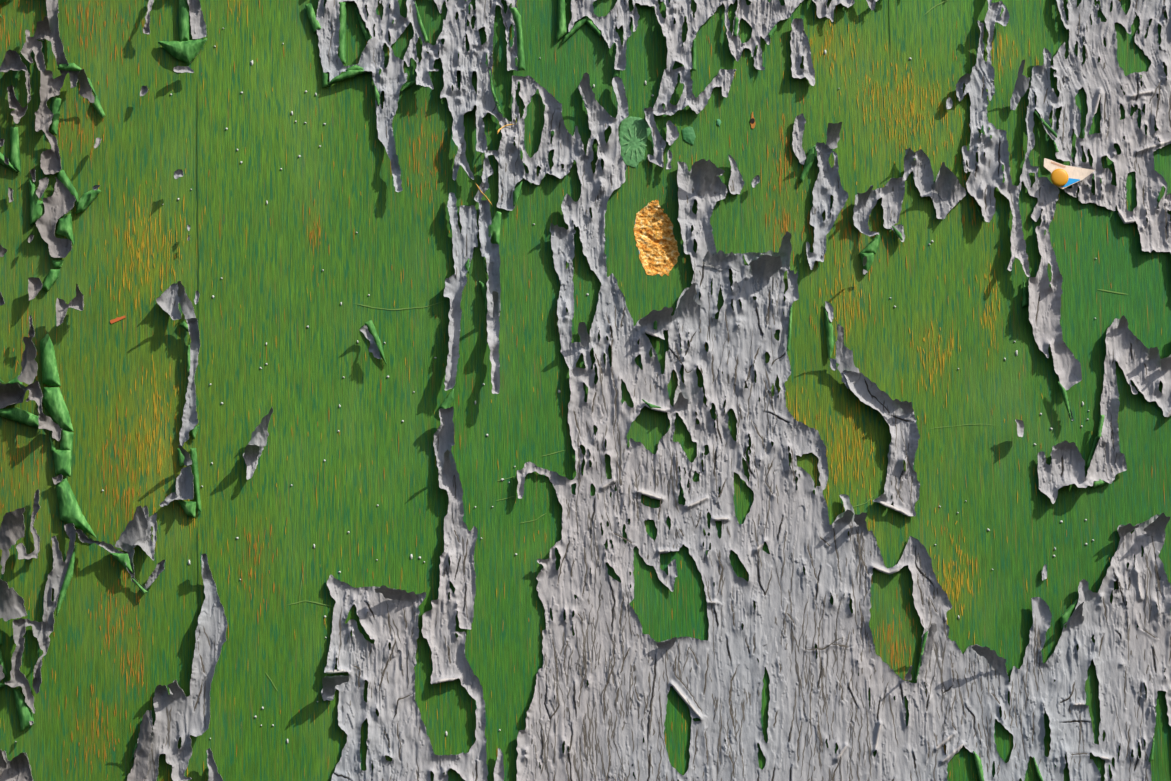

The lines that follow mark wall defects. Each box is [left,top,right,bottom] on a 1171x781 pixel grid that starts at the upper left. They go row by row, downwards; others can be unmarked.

peeling [343,0,488,94]
peeling [444,82,564,394]
peeling [551,223,613,402]
peeling [790,0,1051,325]
peeling [1049,69,1137,212]
peeling [1063,0,1167,134]
peeling [0,281,200,725]
peeling [127,553,227,781]
peeling [600,494,722,651]
peeling [825,301,920,535]
peeling [869,565,937,693]
peeling [1085,659,1171,781]